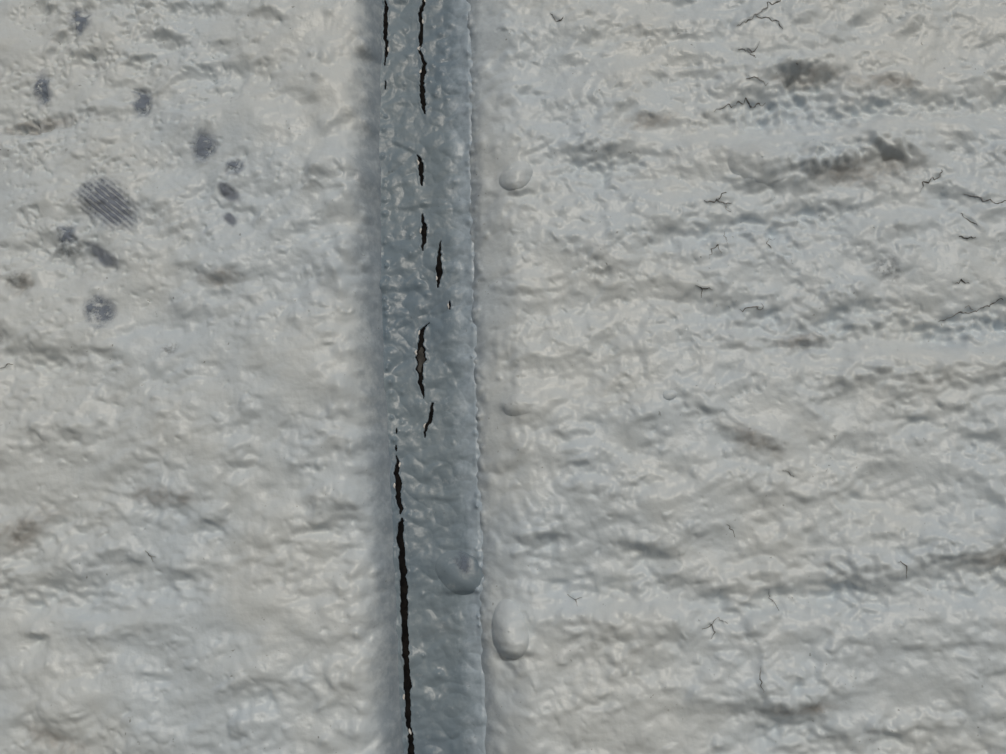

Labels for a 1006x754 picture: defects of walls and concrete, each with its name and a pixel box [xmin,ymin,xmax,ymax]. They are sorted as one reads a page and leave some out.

crack [382,0,390,89]
crack [417,0,427,114]
crack [714,0,783,112]
crack [416,155,424,186]
crack [419,214,451,310]
crack [414,323,434,438]
crack [393,428,415,754]